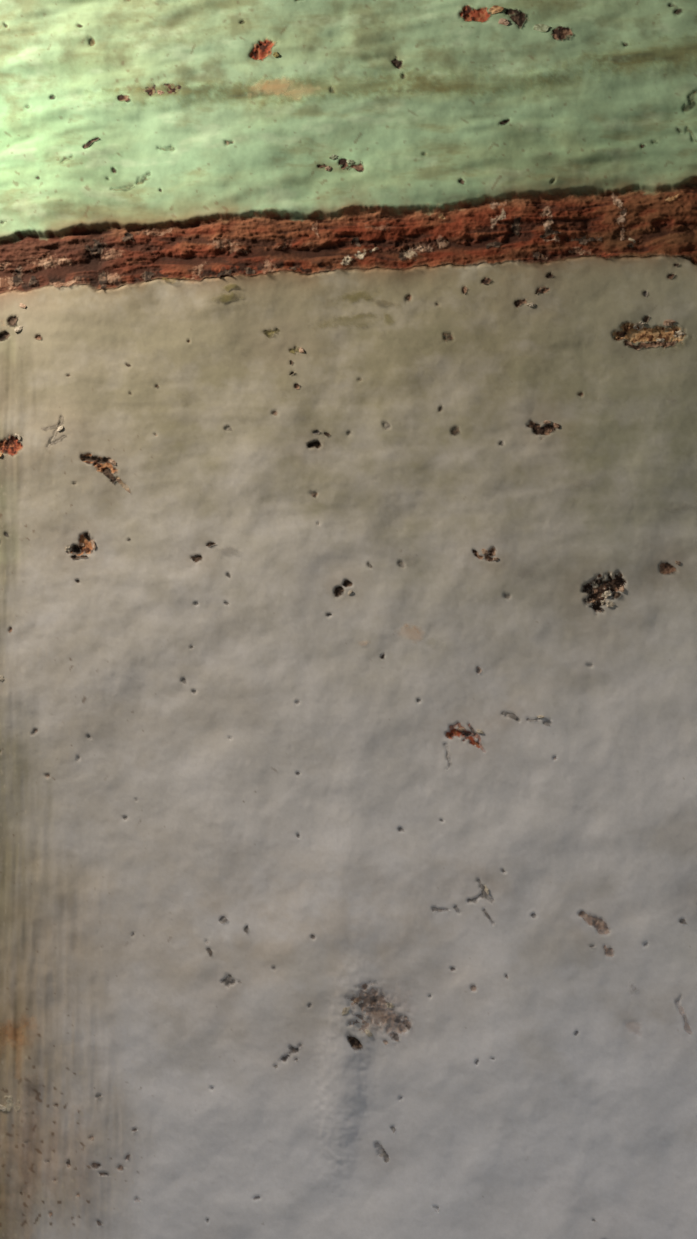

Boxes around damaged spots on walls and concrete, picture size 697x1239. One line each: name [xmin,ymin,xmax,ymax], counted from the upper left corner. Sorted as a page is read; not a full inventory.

spalling [613,316,685,350]